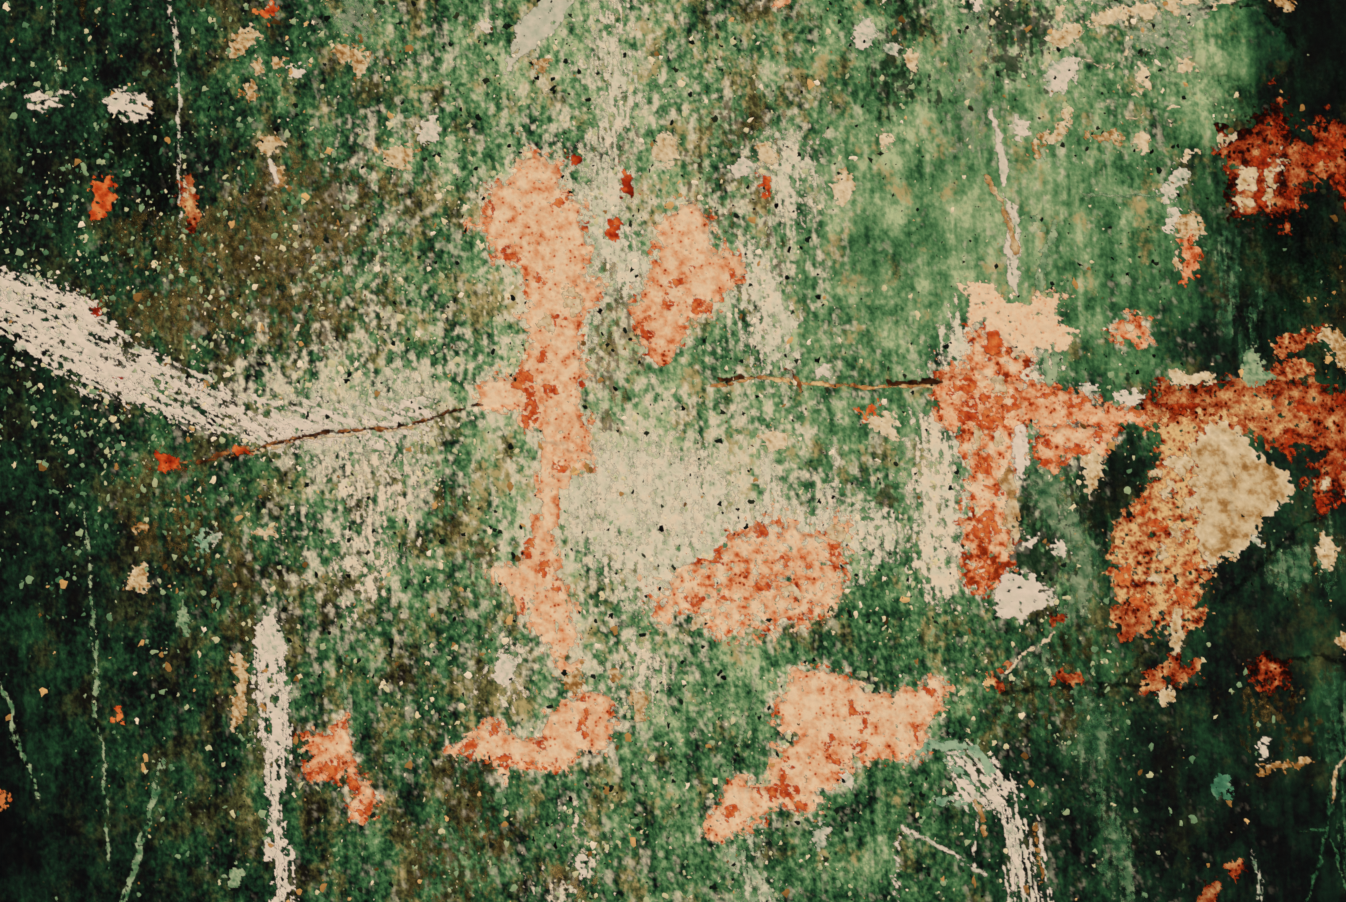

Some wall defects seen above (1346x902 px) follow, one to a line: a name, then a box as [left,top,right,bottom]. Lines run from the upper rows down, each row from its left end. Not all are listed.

rust [1210,78,1346,236]
rust [1172,229,1204,288]
rust [1101,308,1155,350]
crack [709,368,943,393]
crack [177,403,483,469]
rust [928,322,1346,711]
peeling [443,306,856,818]
peeling [357,601,435,683]
peeling [906,776,954,822]